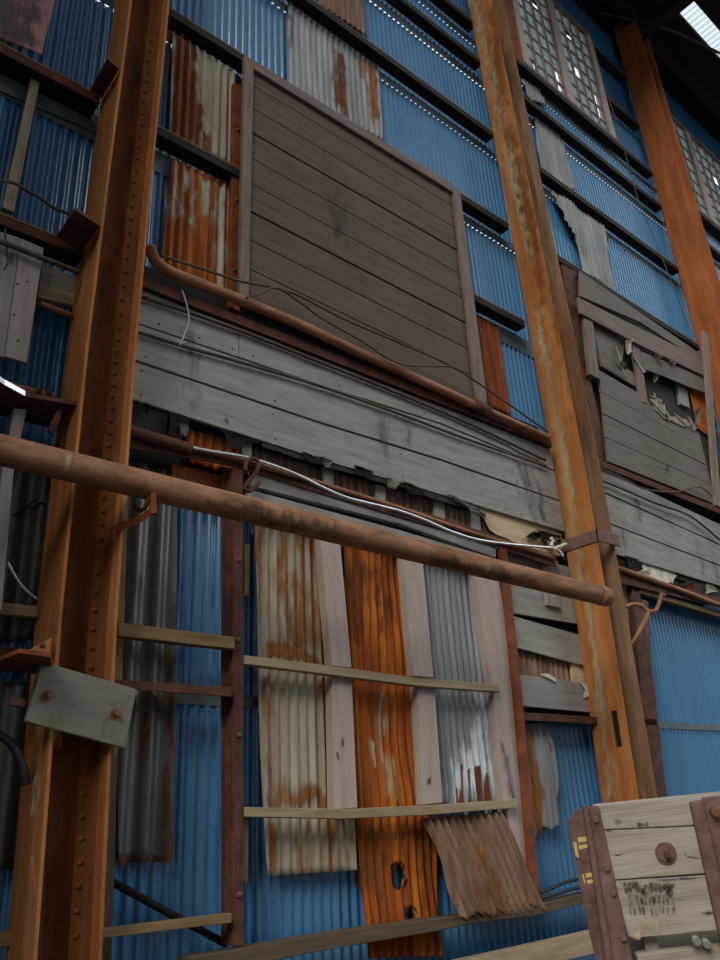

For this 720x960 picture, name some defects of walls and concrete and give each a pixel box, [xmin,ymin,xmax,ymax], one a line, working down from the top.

rust [170,30,236,163]
rust [162,158,229,288]
peeling [131,400,190,440]
rust [186,429,321,481]
rust [334,471,432,515]
spalling [223,430,565,556]
rust [476,316,511,415]
spalling [616,339,701,431]
rust [267,532,325,665]
rust [262,676,327,809]
rust [329,546,438,925]
rust [367,931,443,958]